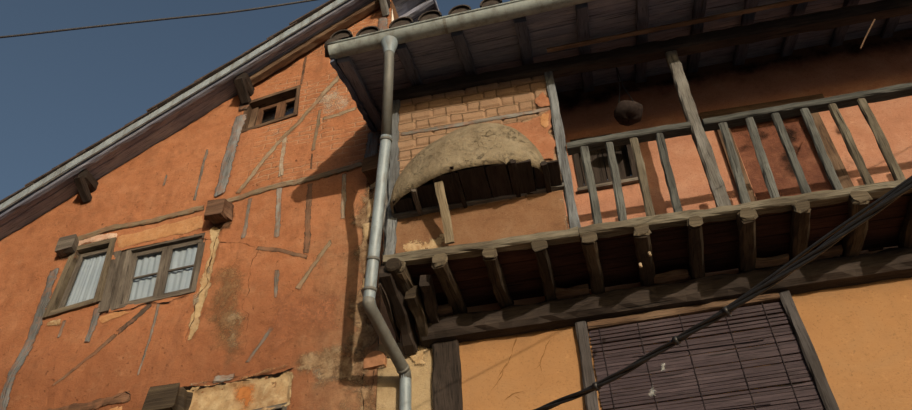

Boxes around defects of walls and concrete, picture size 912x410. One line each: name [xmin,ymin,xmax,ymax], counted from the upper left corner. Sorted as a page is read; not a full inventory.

flaking render [504,92,556,159]
spalling [403,234,444,252]
flaking render [78,216,220,342]
flaking render [186,189,378,410]
crack [183,365,293,391]